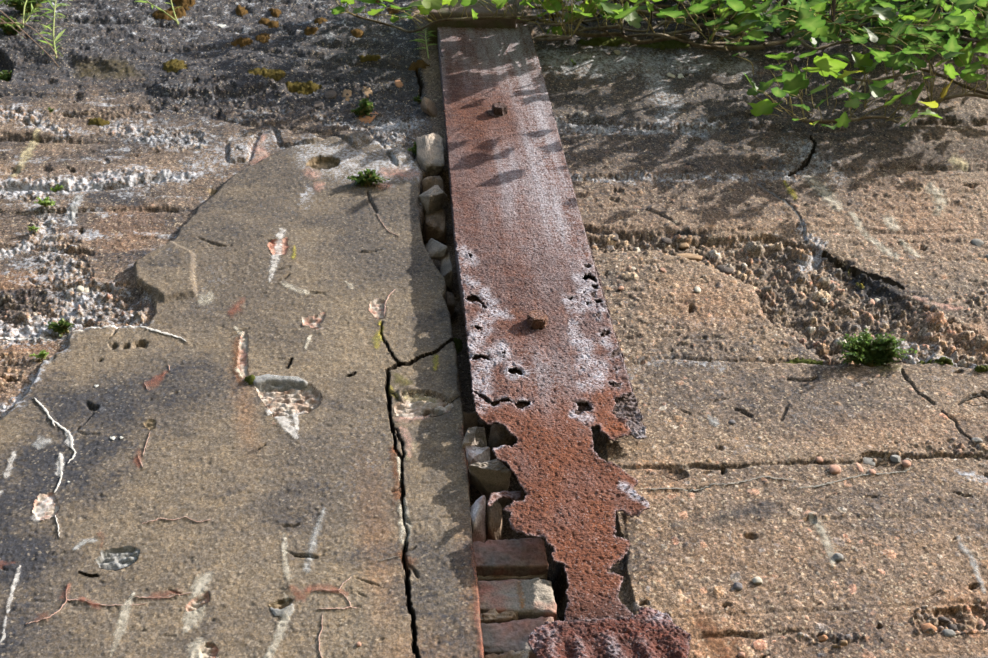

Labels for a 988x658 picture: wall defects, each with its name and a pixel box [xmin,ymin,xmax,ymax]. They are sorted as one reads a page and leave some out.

crack [757,134,905,290]
crack [379,289,455,658]
rust [487,491,522,507]